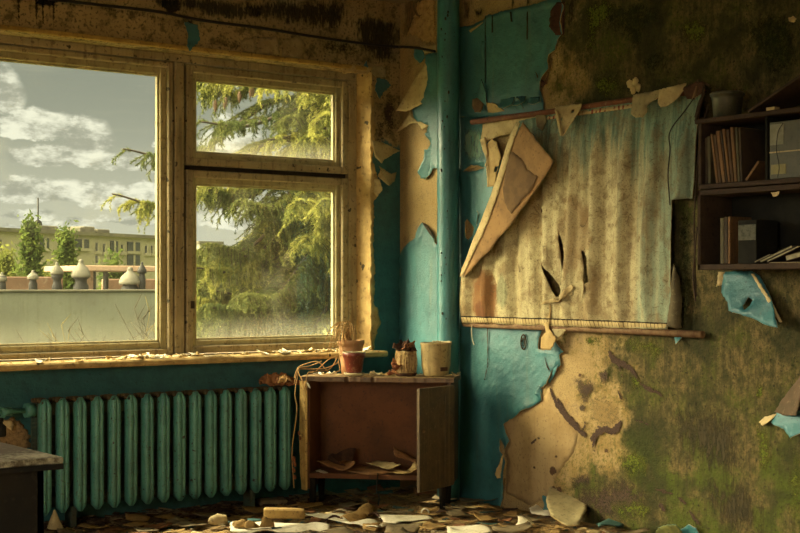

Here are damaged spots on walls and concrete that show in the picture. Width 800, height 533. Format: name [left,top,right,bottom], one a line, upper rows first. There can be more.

damp [35,0,79,24]
damp [109,0,395,63]
peeling [395,0,450,180]
peeling [626,77,641,94]
peeling [372,140,399,197]
crack [608,351,662,399]
spalling [0,417,31,448]
peeling [459,307,578,510]
crack [550,388,649,451]